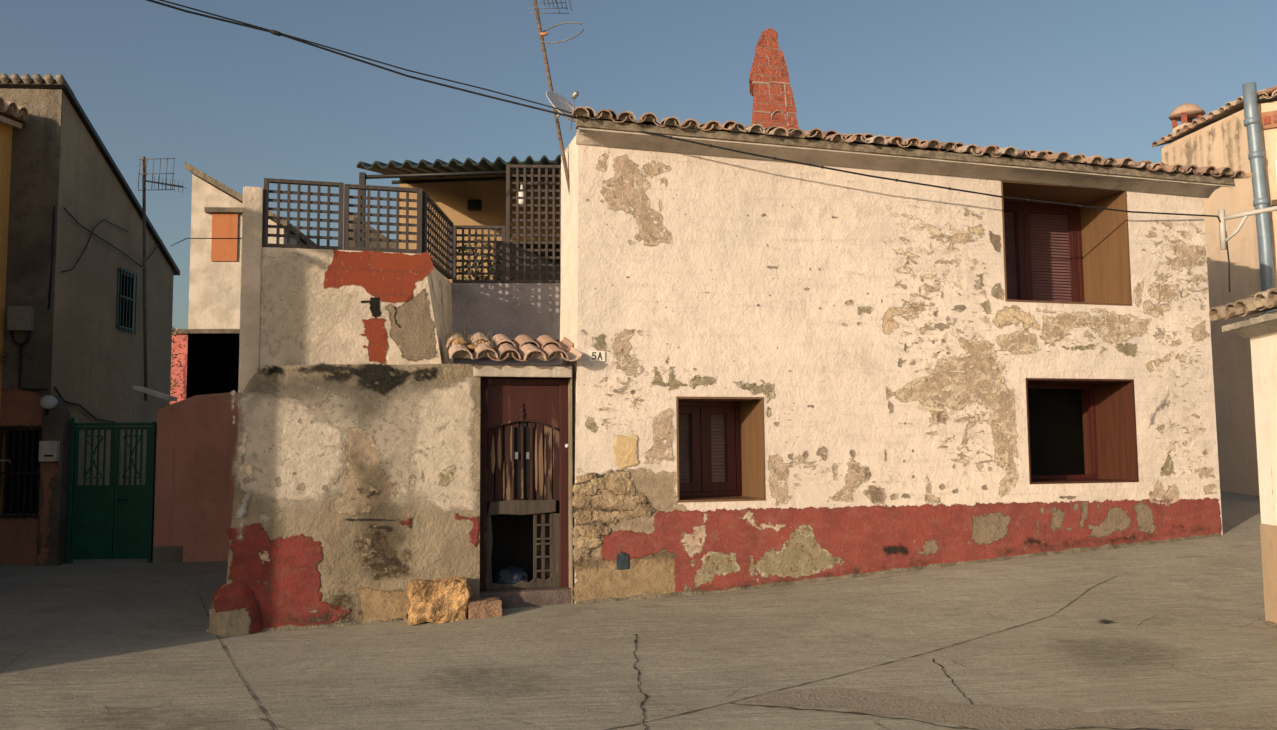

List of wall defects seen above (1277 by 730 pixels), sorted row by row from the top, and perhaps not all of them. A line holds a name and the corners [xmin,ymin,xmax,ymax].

peeling [586,152,672,246]
peeling [227,378,480,629]
spalling [571,329,716,568]
peeling [628,509,844,592]
peeling [733,380,779,426]
peeling [767,446,958,506]
peeling [971,512,1010,545]
peeling [819,202,1217,538]
crack [633,634,648,730]
crack [862,653,975,730]